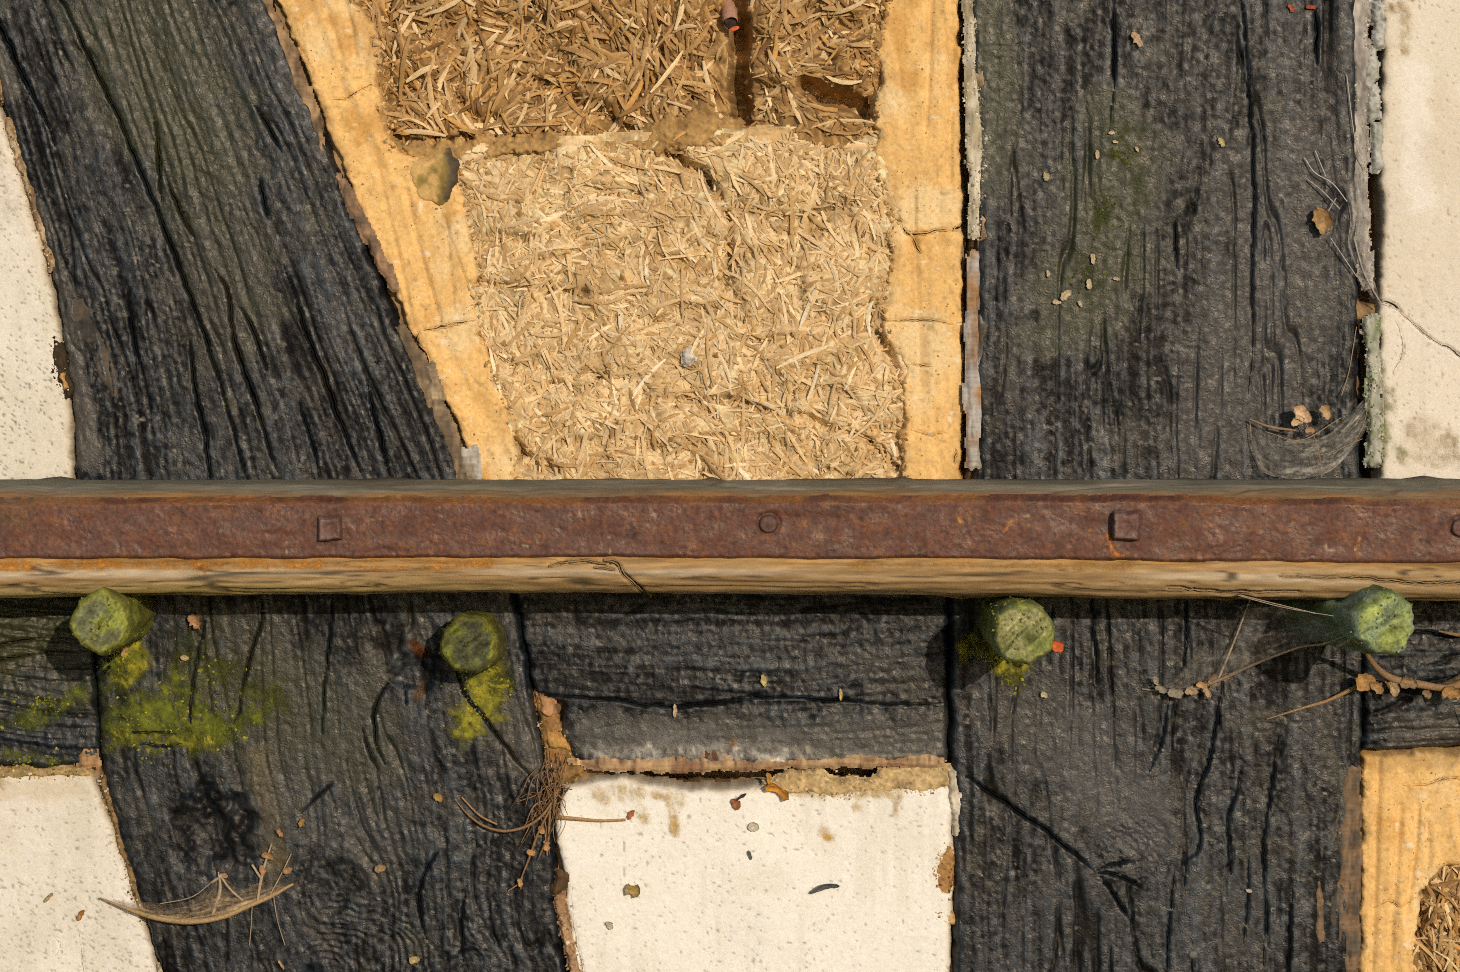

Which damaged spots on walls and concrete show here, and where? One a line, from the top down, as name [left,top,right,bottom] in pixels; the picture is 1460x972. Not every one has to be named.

peeling [336,173,399,292]
spalling [349,0,909,480]
crack [1368,298,1460,375]
corrosion [60,559,323,569]
damp [114,636,286,749]
spalling [1412,865,1460,972]